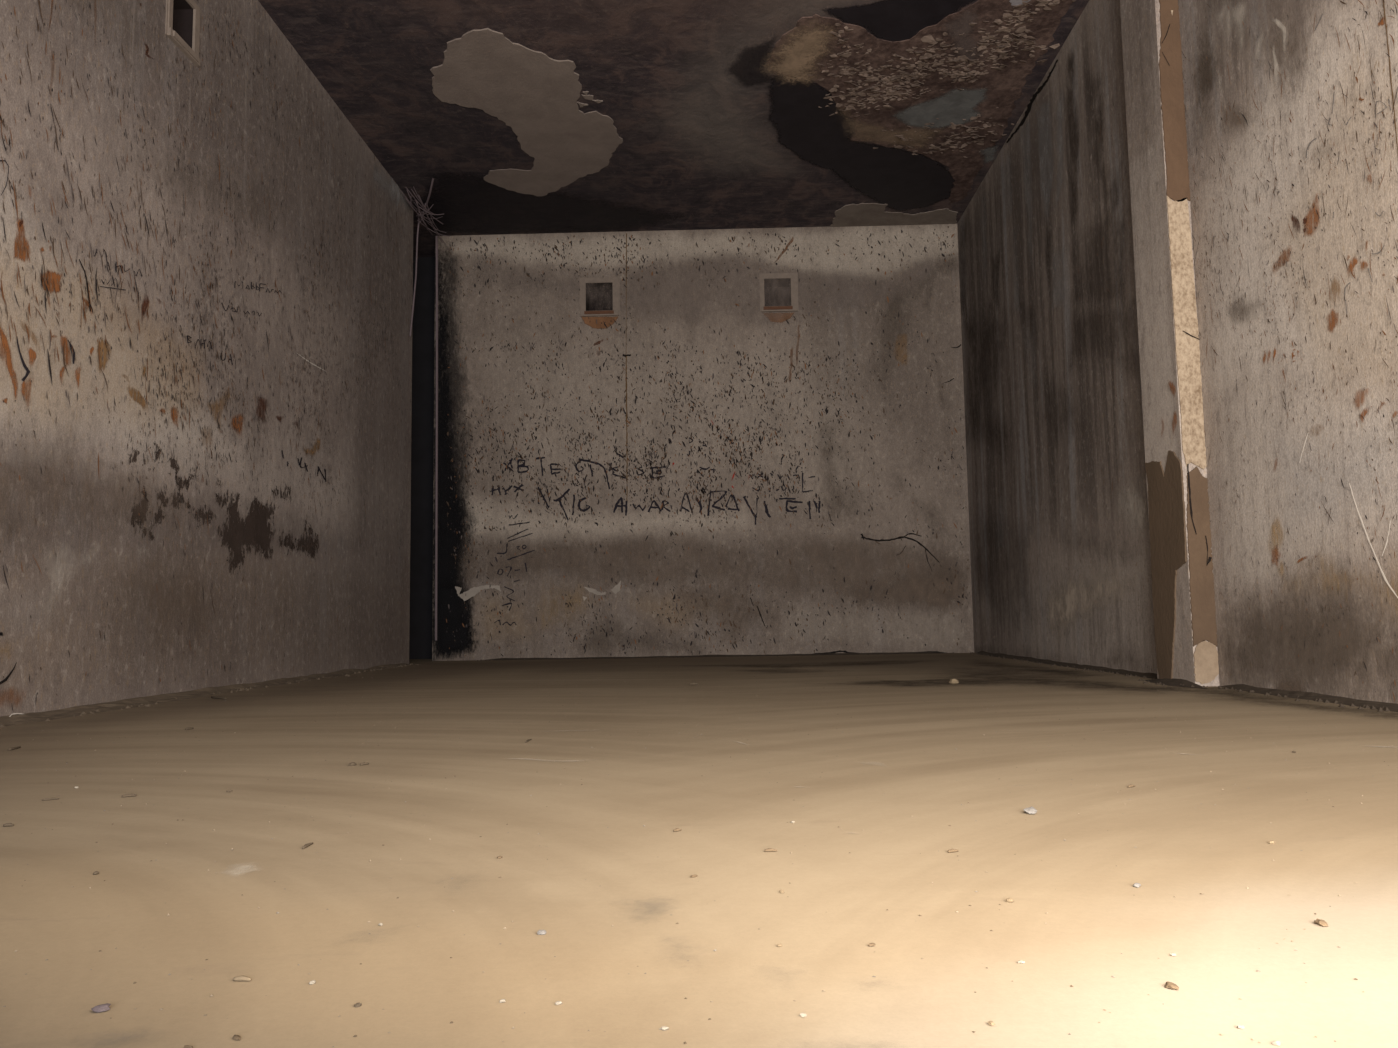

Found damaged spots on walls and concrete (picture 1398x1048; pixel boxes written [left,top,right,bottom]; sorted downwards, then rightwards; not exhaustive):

peeling [430,28,623,196]
peeling [763,0,1074,227]
corrosion [14,220,51,262]
corrosion [1292,196,1319,235]
corrosion [1328,242,1368,331]
corrosion [0,328,36,404]
corrosion [52,335,80,386]
corrosion [90,340,109,371]
corrosion [124,367,186,423]
corrosion [209,393,298,433]
damp [417,173,674,661]
peeling [1145,0,1219,684]